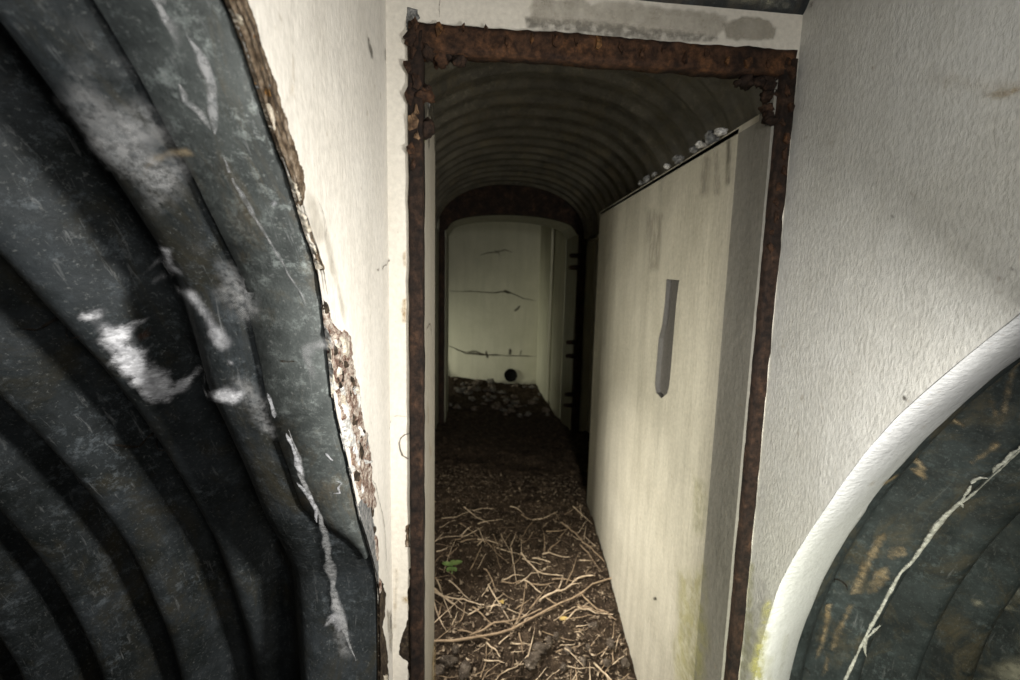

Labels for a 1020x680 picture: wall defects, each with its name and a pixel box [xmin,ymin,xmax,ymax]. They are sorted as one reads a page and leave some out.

water stain [699,15,775,40]
rust [403,17,420,171]
spalling [224,0,325,274]
rust [781,133,791,176]
crack [453,291,535,311]
crack [427,324,530,358]
peeling [321,296,411,680]
rust [854,537,888,592]